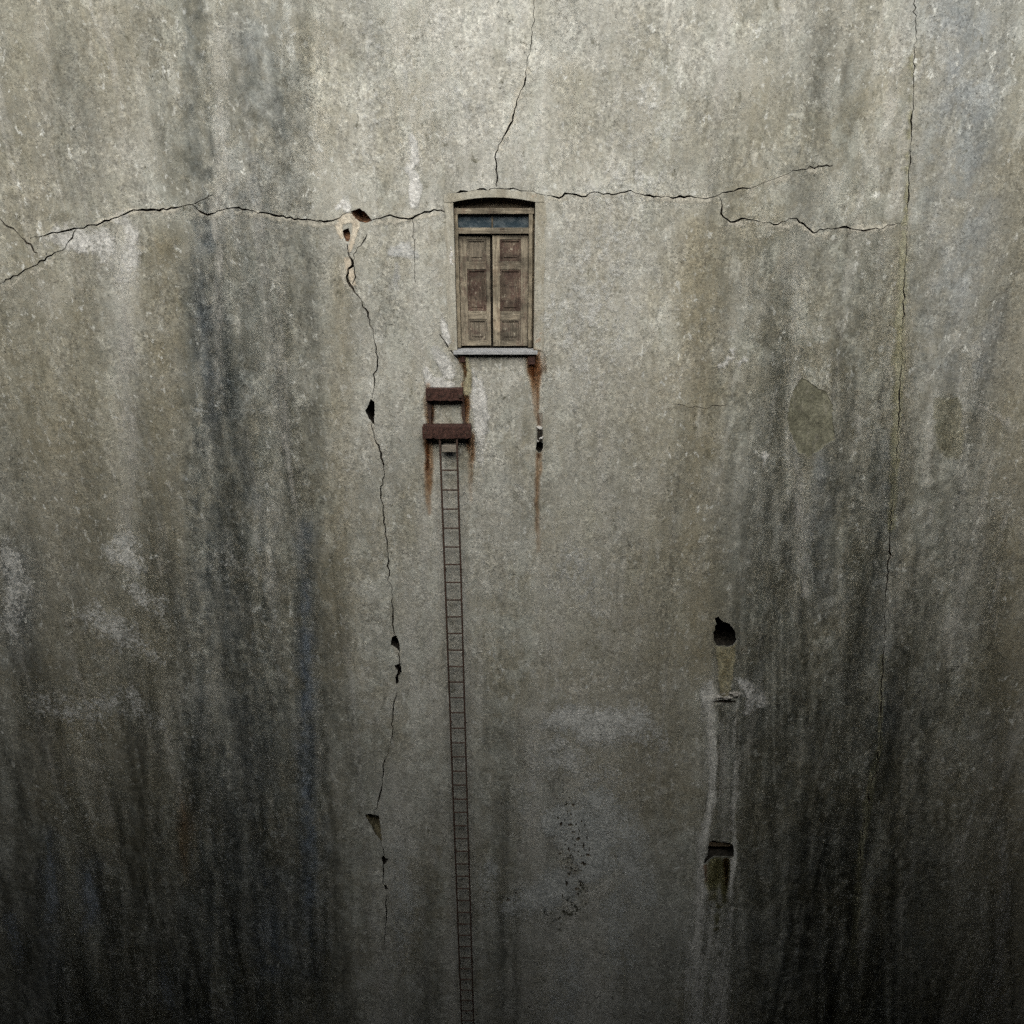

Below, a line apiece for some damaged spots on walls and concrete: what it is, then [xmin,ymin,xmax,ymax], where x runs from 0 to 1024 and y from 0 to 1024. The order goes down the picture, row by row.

spalling [335,199,371,286]
crack [0,195,445,396]
spalling [365,399,375,424]
corrosion [458,355,471,419]
crack [456,0,917,963]
damp [0,537,34,636]
damp [104,532,163,617]
crack [368,422,401,814]
spalling [391,633,402,684]
spalling [713,616,736,646]
damp [685,680,728,1024]
damp [724,749,738,918]